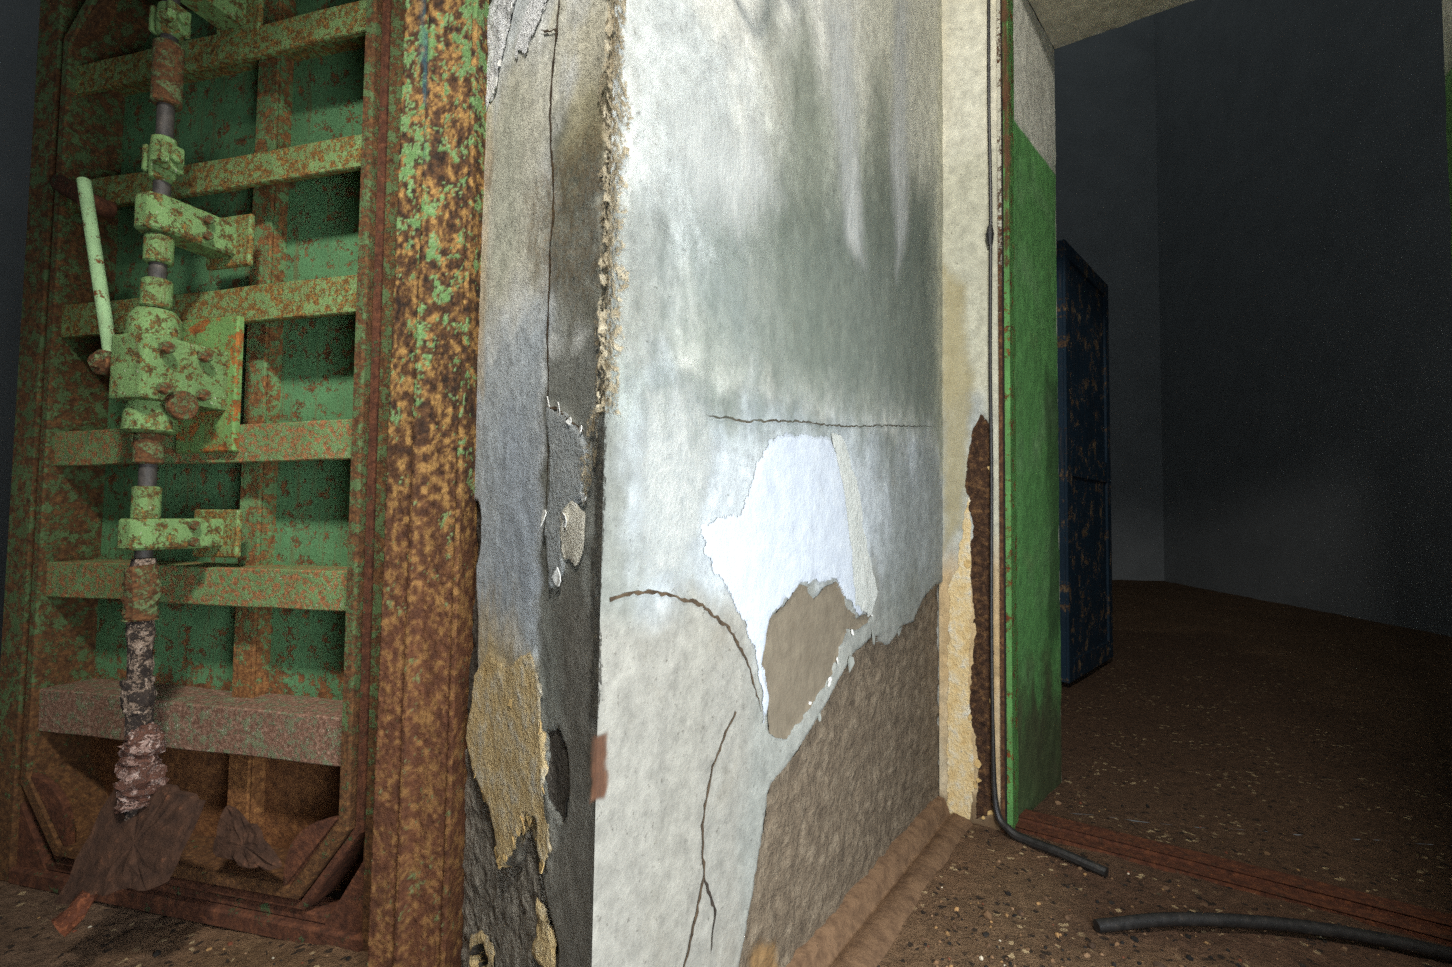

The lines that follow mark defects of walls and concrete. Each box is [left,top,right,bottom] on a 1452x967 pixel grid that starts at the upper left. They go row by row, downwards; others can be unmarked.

crack [541,0,587,502]
spalling [541,0,634,720]
damp [675,110,764,211]
damp [825,2,860,252]
damp [892,0,907,248]
rust [213,805,282,870]
peeling [461,589,569,967]
spalling [642,380,939,967]